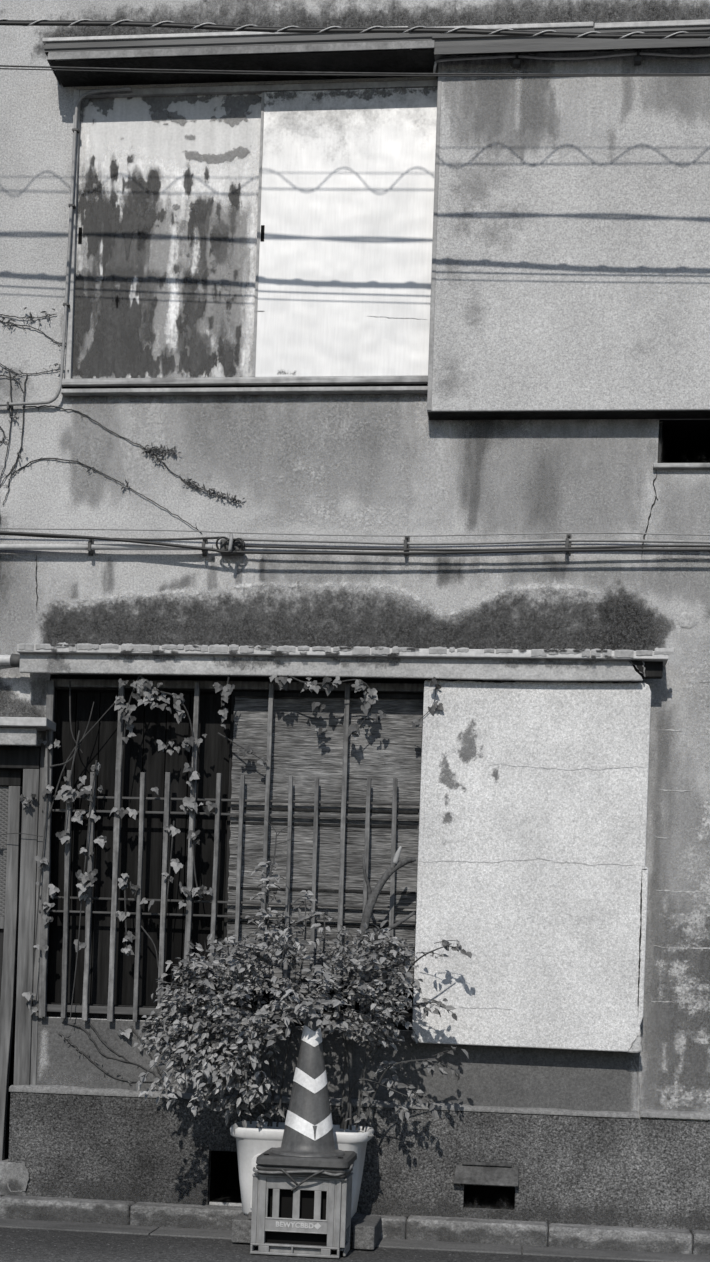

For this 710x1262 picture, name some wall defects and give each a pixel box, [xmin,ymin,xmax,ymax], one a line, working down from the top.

damp [488,58,543,155]
damp [583,61,609,141]
peeling [72,94,262,379]
damp [63,394,652,540]
damp [412,557,487,587]
damp [505,485,710,601]
crack [642,471,710,559]
damp [644,696,710,1111]